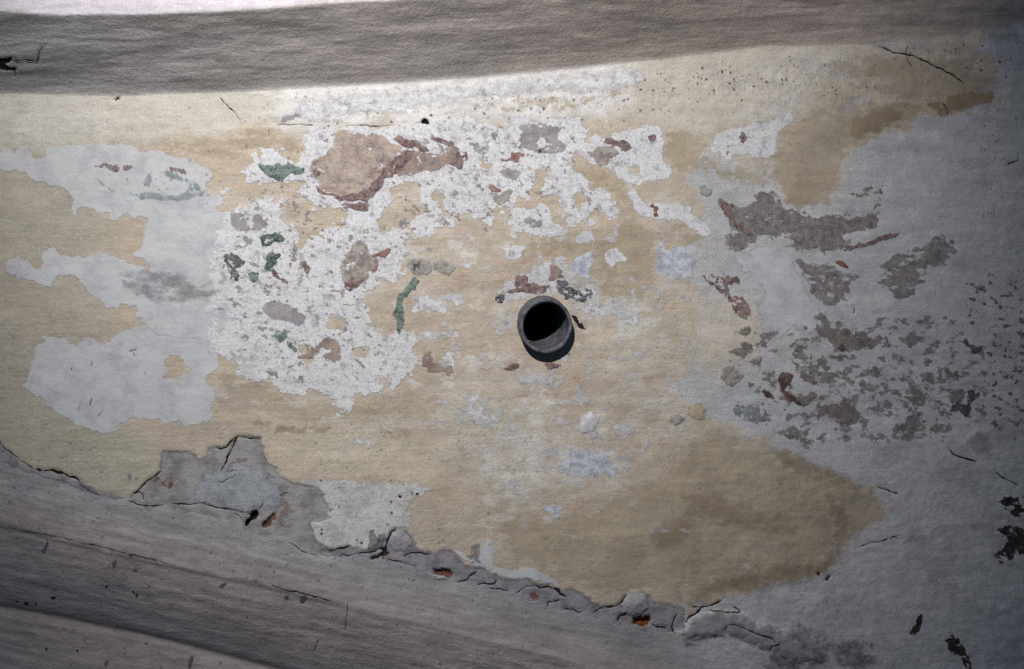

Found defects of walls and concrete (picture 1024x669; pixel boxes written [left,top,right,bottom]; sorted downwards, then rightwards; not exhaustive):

leakage [666,91,993,209]
peeling [0,64,711,442]
peeling [734,246,822,338]
peeling [799,370,817,384]
crack [0,442,98,495]
crack [128,435,287,522]
flaking render [0,435,685,633]
crack [291,528,430,565]
peeling [497,405,656,494]
leakage [503,433,838,590]
crack [457,571,626,621]
crack [651,600,780,650]